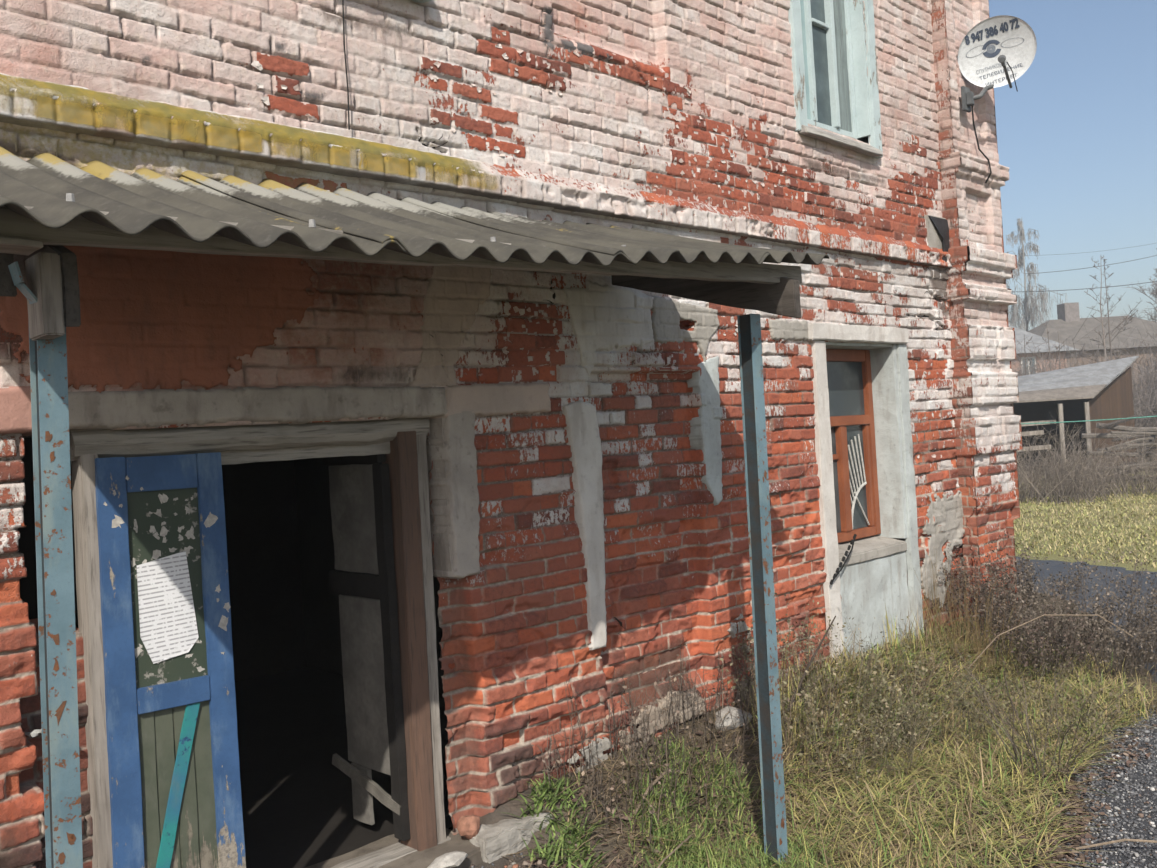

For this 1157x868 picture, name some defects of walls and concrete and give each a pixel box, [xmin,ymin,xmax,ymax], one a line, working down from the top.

damp [0,142,42,157]
damp [35,95,496,190]
peeling [421,23,942,246]
peeling [477,301,567,382]
peeling [641,321,714,388]
peeling [709,303,746,341]
rust [45,431,55,462]
spalling [602,462,621,490]
spalling [602,555,692,652]
spalling [440,626,557,680]
rust [54,701,66,724]
rust [58,832,76,865]